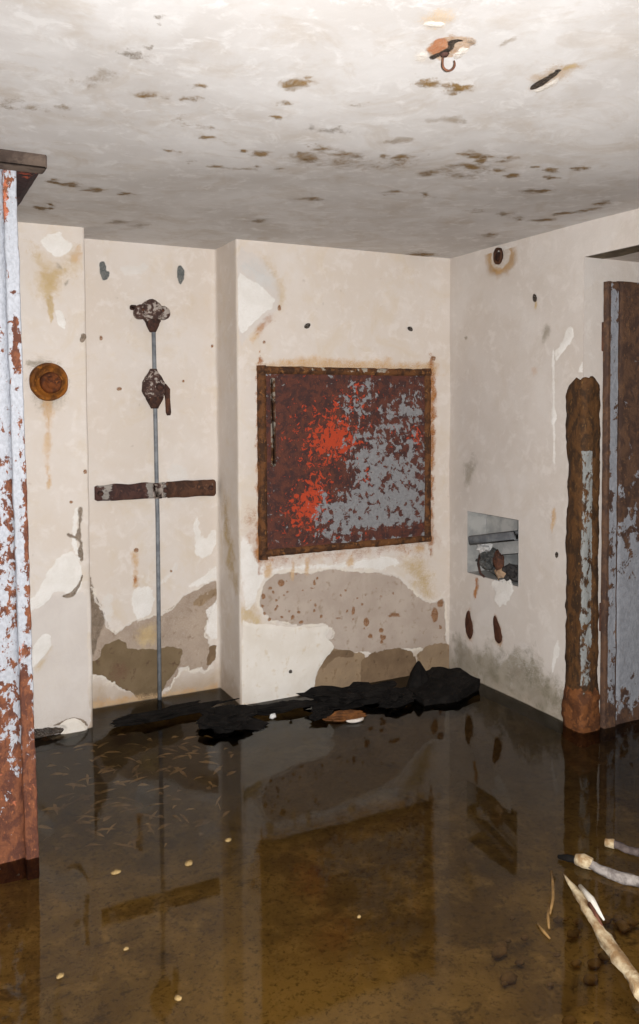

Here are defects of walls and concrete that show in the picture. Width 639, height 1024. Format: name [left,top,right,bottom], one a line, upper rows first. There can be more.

water stain [271,76,320,120]
water stain [415,77,475,96]
water stain [163,125,590,194]
peeling [40,232,73,257]
peeling [237,245,289,347]
rust [484,246,518,279]
water stain [589,245,639,259]
rust [24,356,76,489]
rust [222,304,441,624]
flaking render [30,516,218,695]
flaking render [240,539,449,656]
rust [336,590,386,643]